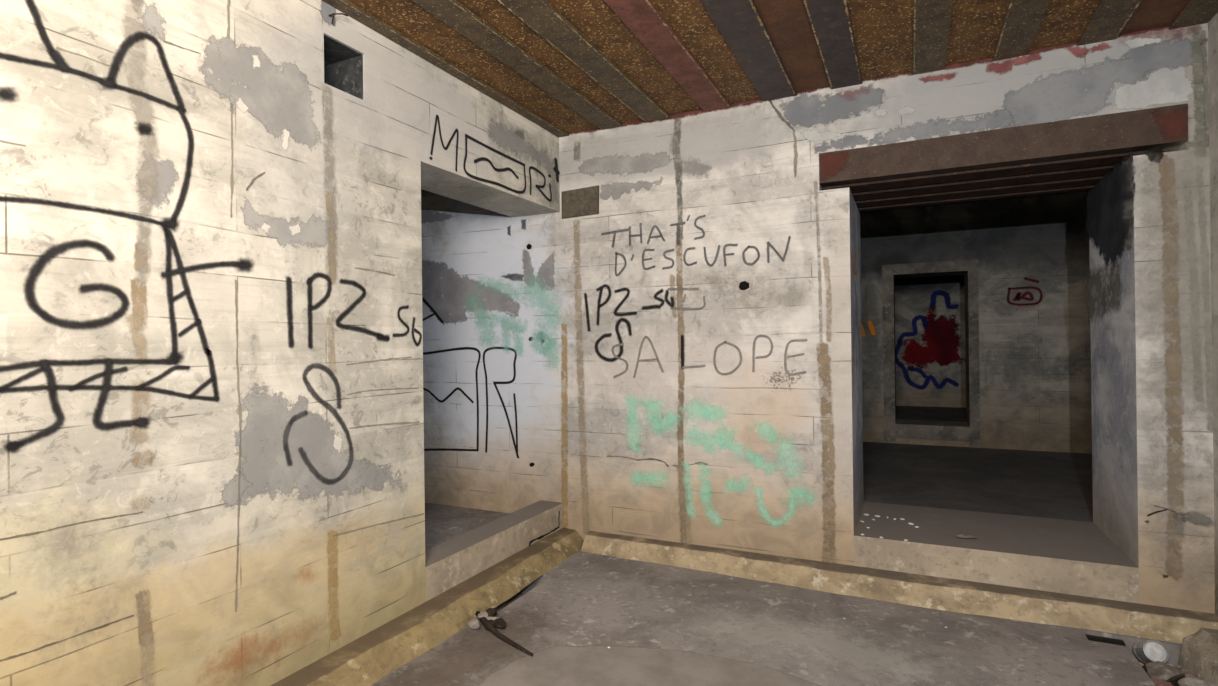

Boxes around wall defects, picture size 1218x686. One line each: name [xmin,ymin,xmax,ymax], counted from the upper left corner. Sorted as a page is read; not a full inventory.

flaking render [199,36,320,151]
flaking render [749,0,1202,153]
flaking render [241,197,337,248]
corrosion [814,153,848,196]
flaking render [222,384,402,508]
corrosion [816,215,835,563]
damp [392,613,538,686]